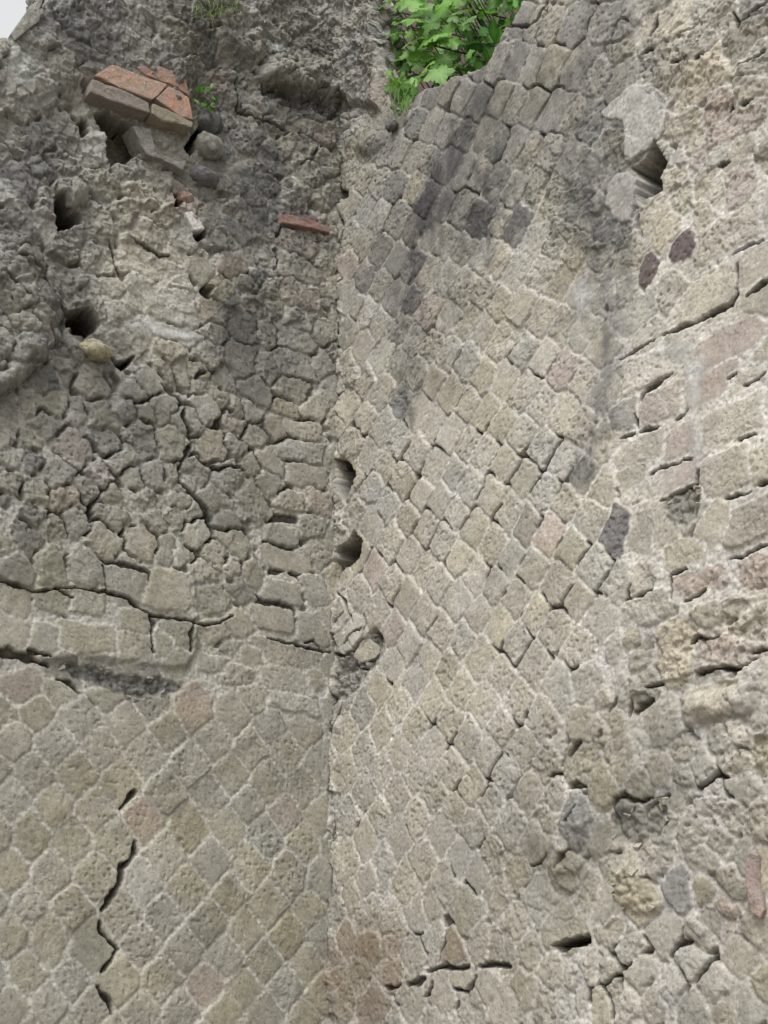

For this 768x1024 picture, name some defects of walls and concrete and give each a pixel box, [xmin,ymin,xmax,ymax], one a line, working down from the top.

spalling [96,121,132,167]
spalling [174,200,204,242]
crack [674,246,768,333]
spalling [64,318,88,340]
crack [624,378,683,439]
crack [134,394,313,579]
crack [0,562,232,653]
crack [256,597,294,616]
crack [0,648,75,692]
crack [702,649,767,675]
crack [96,842,134,1014]
crack [389,916,512,997]